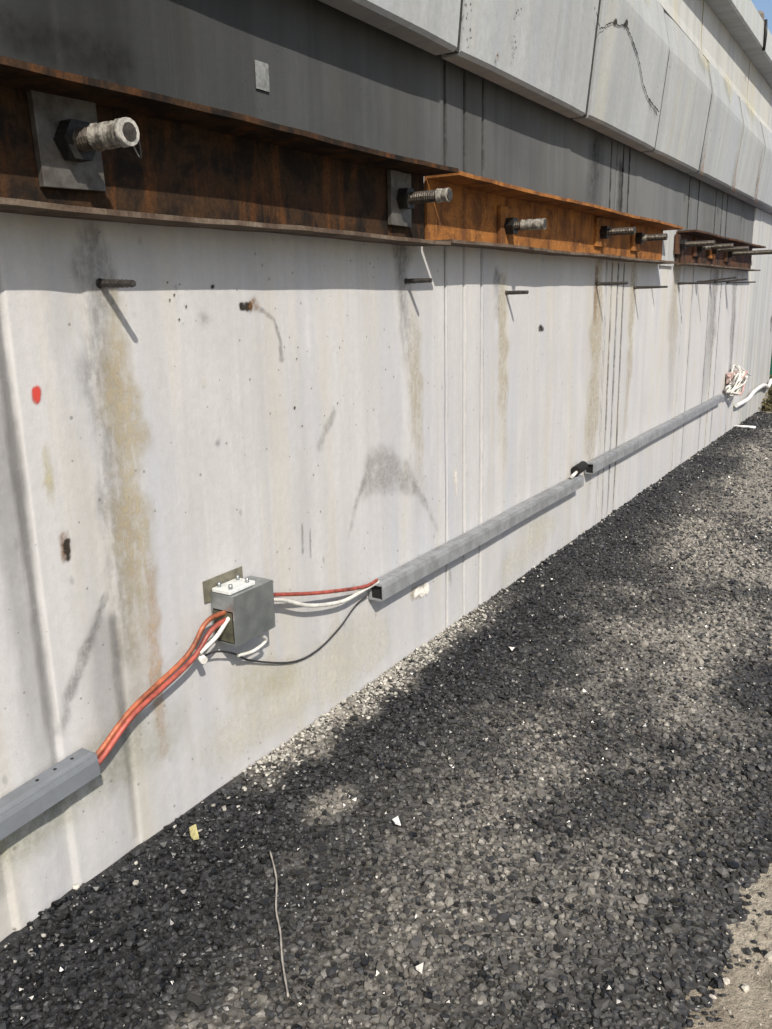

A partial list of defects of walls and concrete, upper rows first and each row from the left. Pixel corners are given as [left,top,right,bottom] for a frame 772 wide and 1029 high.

crack [596,12,659,114]